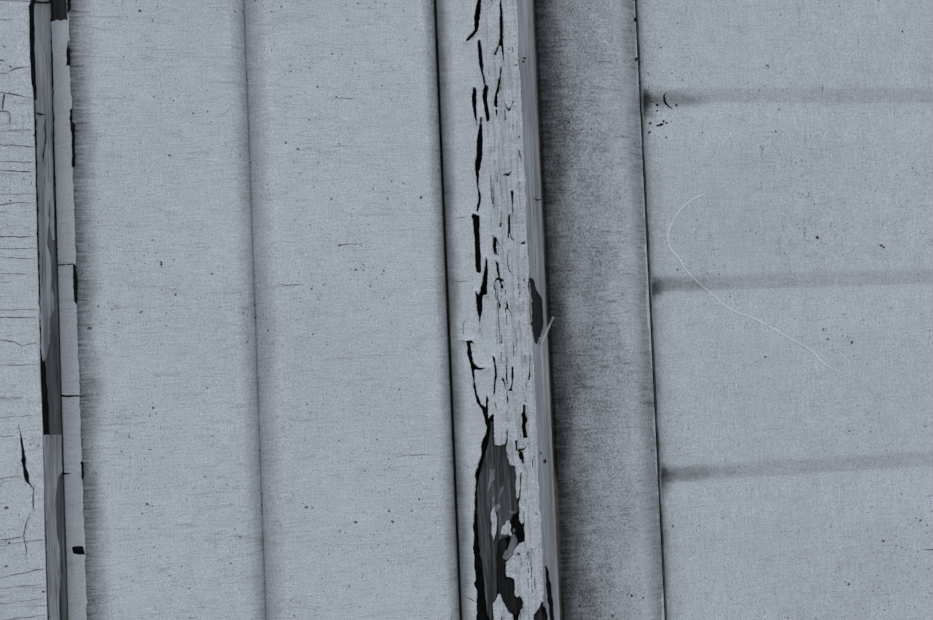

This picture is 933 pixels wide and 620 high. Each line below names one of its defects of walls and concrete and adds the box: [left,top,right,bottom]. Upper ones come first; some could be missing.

crack [0,59,72,366]
peeling [528,278,554,345]
crack [0,397,45,620]
peeling [477,421,523,620]
spalling [534,600,548,620]